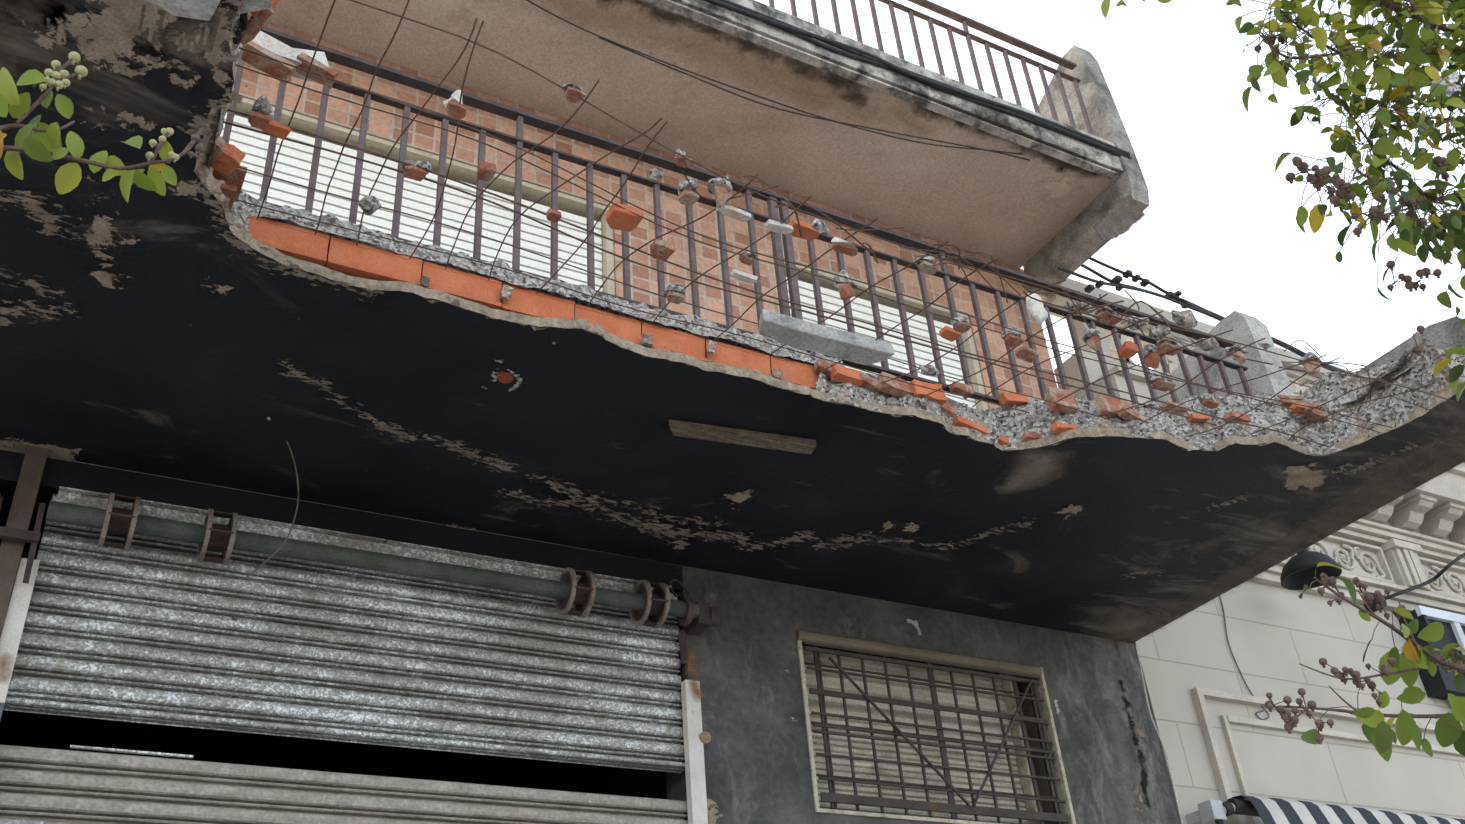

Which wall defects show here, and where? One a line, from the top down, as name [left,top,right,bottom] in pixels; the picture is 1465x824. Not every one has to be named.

peeling [0,265,81,327]
peeling [0,175,140,289]
spalling [22,0,1465,632]
crack [1073,640,1151,824]